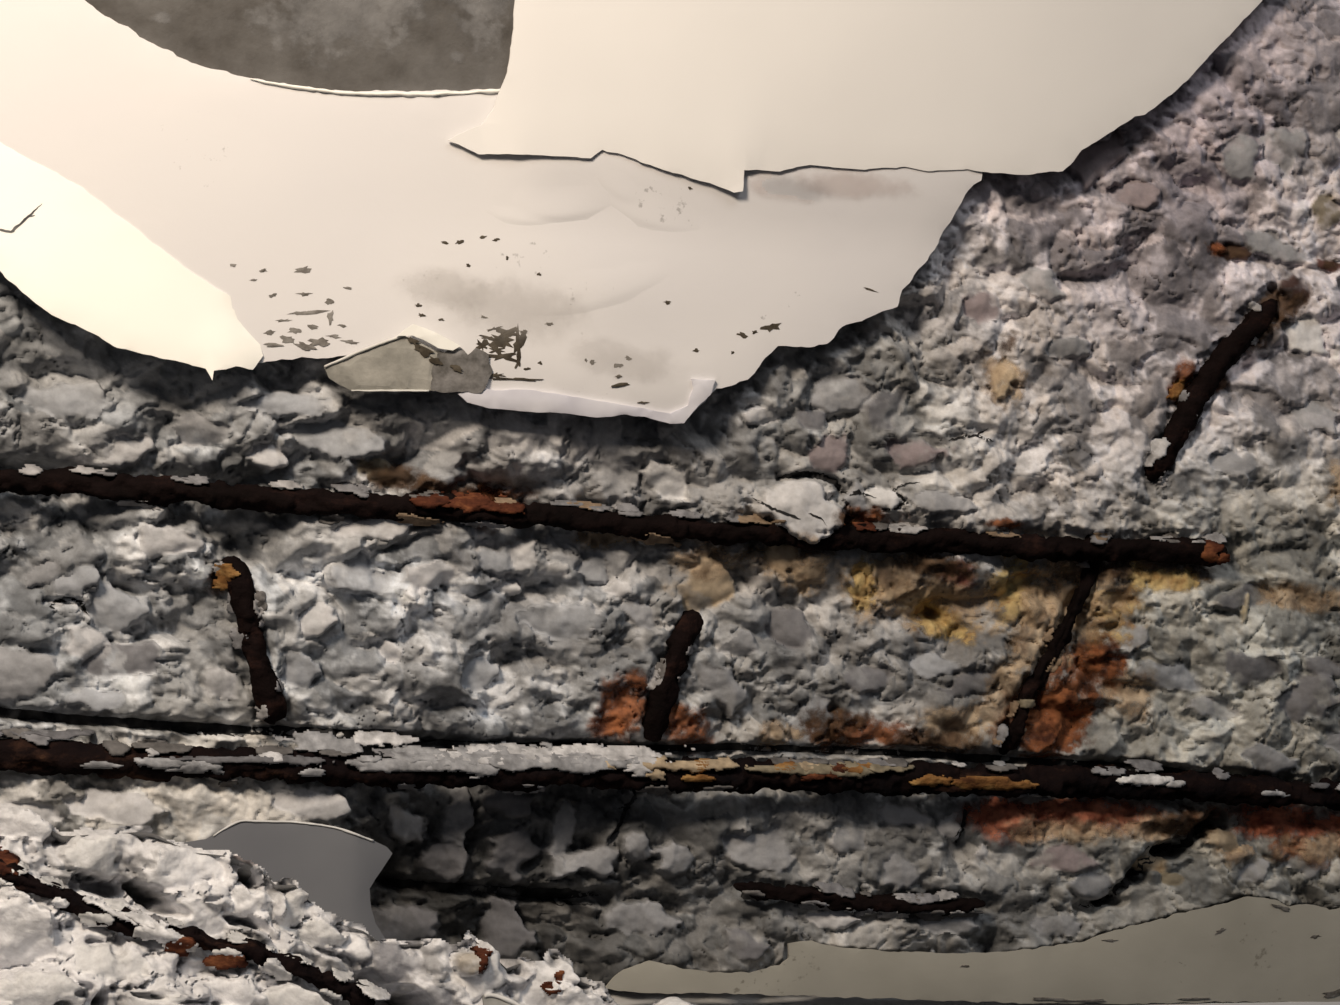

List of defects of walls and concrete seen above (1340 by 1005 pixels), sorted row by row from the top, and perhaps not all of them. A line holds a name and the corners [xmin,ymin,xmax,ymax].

crack [0,206,39,233]
spalling [0,0,1340,784]
rust [1168,362,1196,401]
rust [368,464,532,502]
rust [837,506,885,527]
rust [987,518,1020,529]
rust [675,537,829,594]
rust [761,552,1211,759]
rust [588,669,649,743]
rust [664,704,711,745]
rust [963,796,1340,865]
spalling [0,717,1340,1005]